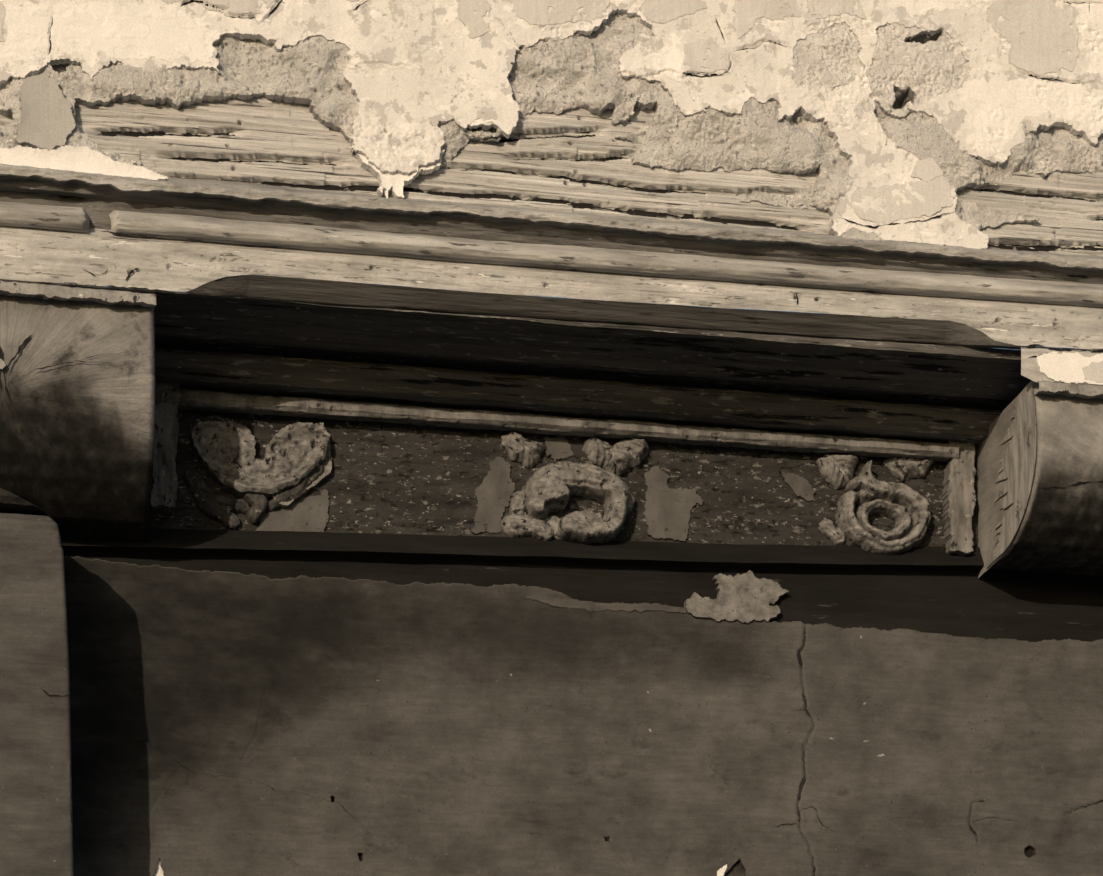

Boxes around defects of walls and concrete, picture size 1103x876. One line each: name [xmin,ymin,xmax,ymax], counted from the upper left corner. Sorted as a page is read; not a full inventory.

crack [181,0,282,23]
crack [683,19,789,77]
crack [1025,73,1080,84]
flaking render [0,0,1103,249]
peeling [1036,351,1103,385]
peeling [985,383,1037,567]
flaking render [525,570,789,624]
crack [776,629,832,876]
flaking render [717,860,744,876]